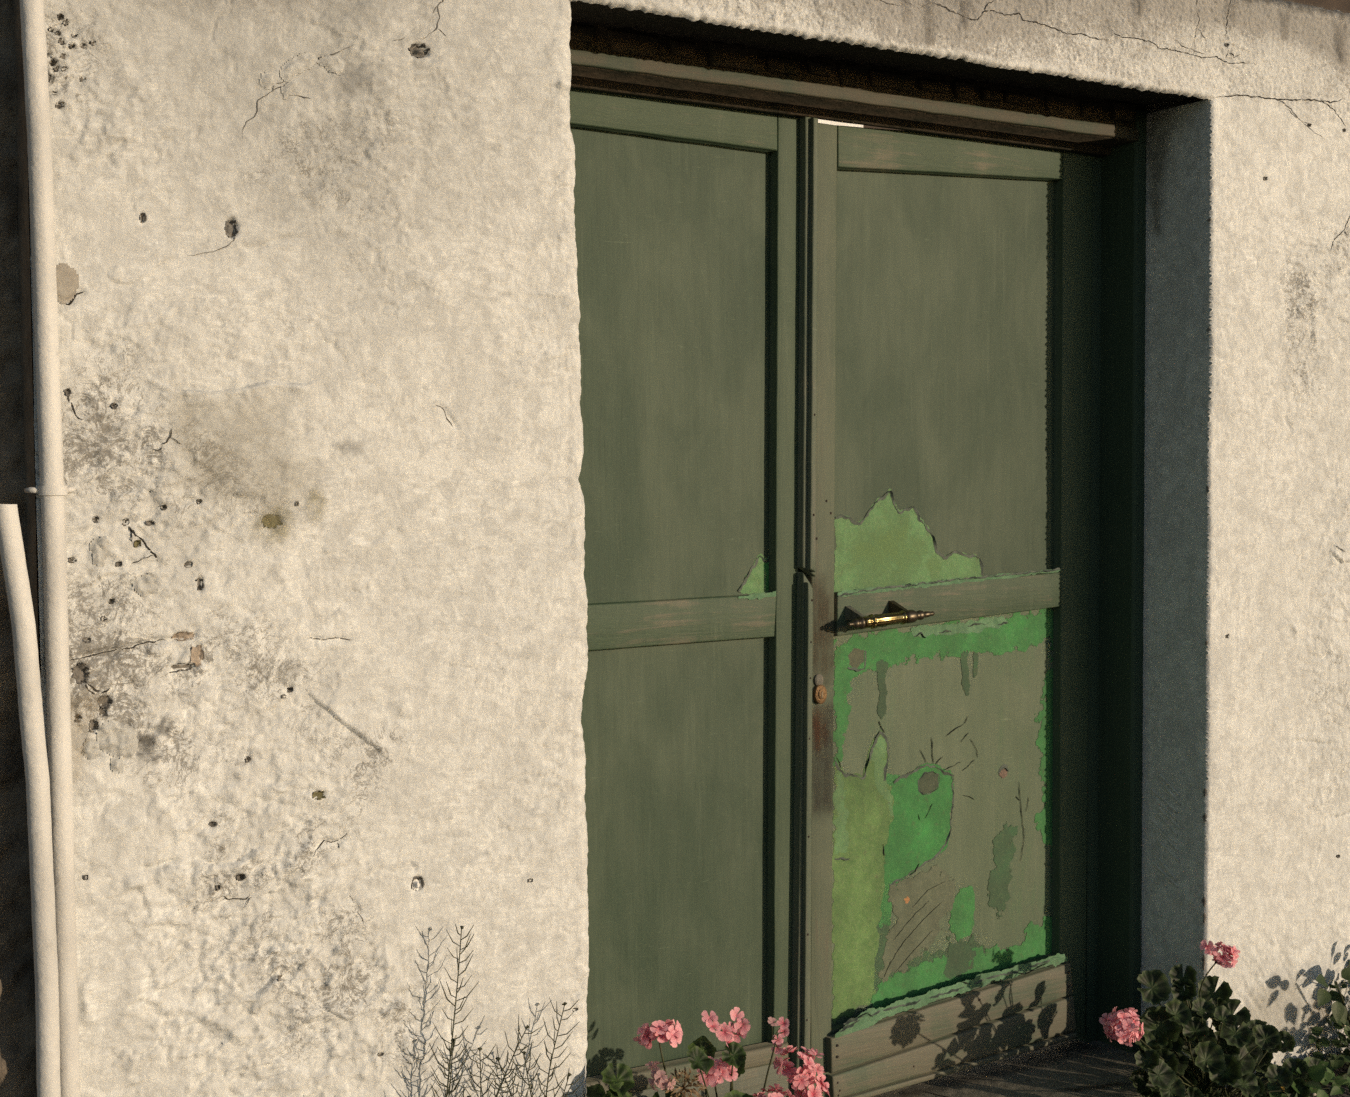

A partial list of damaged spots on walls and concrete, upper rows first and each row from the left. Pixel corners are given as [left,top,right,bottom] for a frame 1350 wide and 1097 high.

crack [243,81,311,129]
crack [394,0,446,41]
crack [881,0,1345,135]
peeling [737,553,776,600]
peeling [834,489,1061,597]
peeling [831,608,1068,1038]